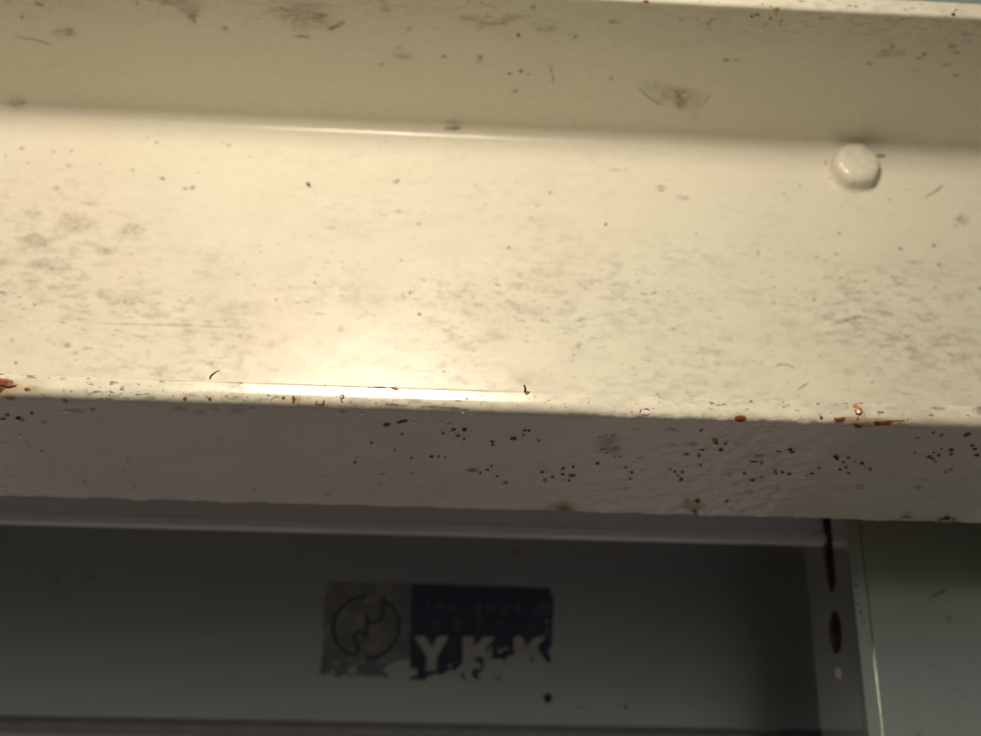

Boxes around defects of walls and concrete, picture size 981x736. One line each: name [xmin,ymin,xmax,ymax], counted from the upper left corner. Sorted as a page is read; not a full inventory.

corrosion [0,378,15,401]
corrosion [819,403,905,428]